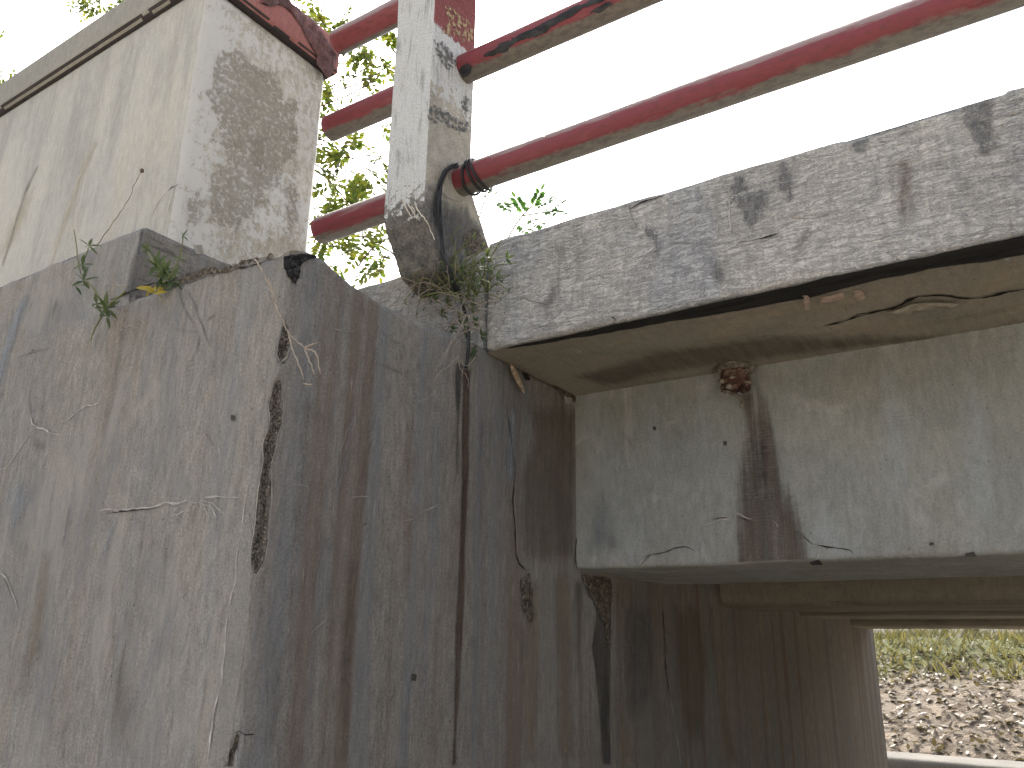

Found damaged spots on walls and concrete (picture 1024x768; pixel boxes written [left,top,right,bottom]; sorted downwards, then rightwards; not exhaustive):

peeling [434,6,474,78]
peeling [484,0,612,57]
crack [95,253,278,364]
crack [820,289,1024,327]
spalling [250,321,289,581]
crack [506,405,526,570]
damp [738,394,806,562]
crack [706,513,853,565]
crack [99,495,245,765]
spalling [520,573,535,622]
spalling [582,574,613,648]
spalling [224,731,255,767]